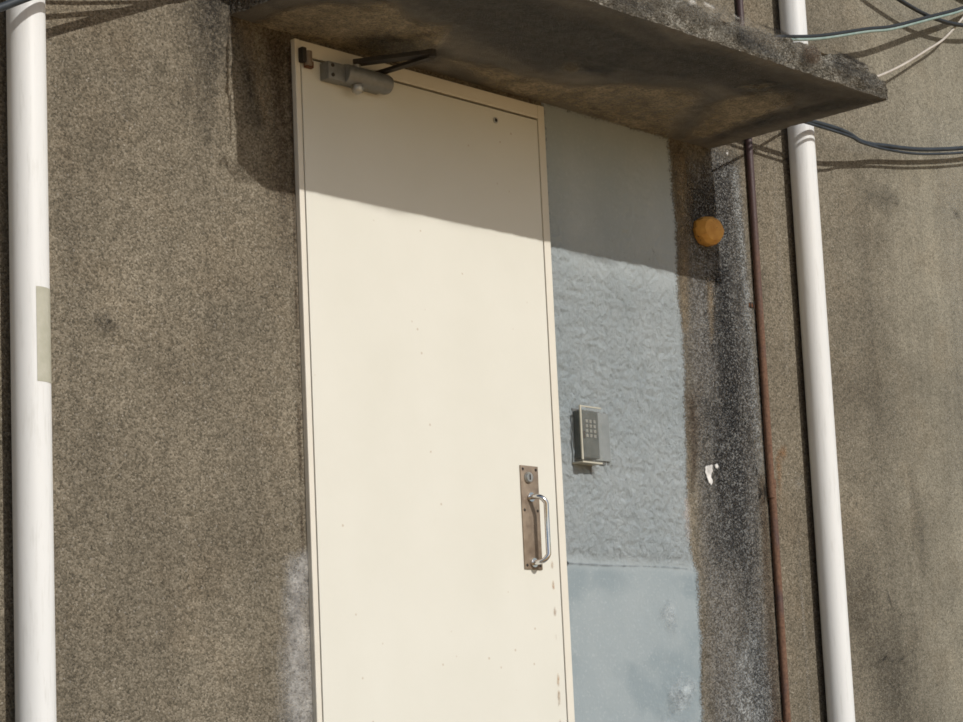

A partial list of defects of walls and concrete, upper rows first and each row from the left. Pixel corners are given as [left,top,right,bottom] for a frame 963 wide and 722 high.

leakage [260,3,444,124]
leakage [470,67,694,136]
leakage [677,151,779,722]
leakage [287,557,313,722]